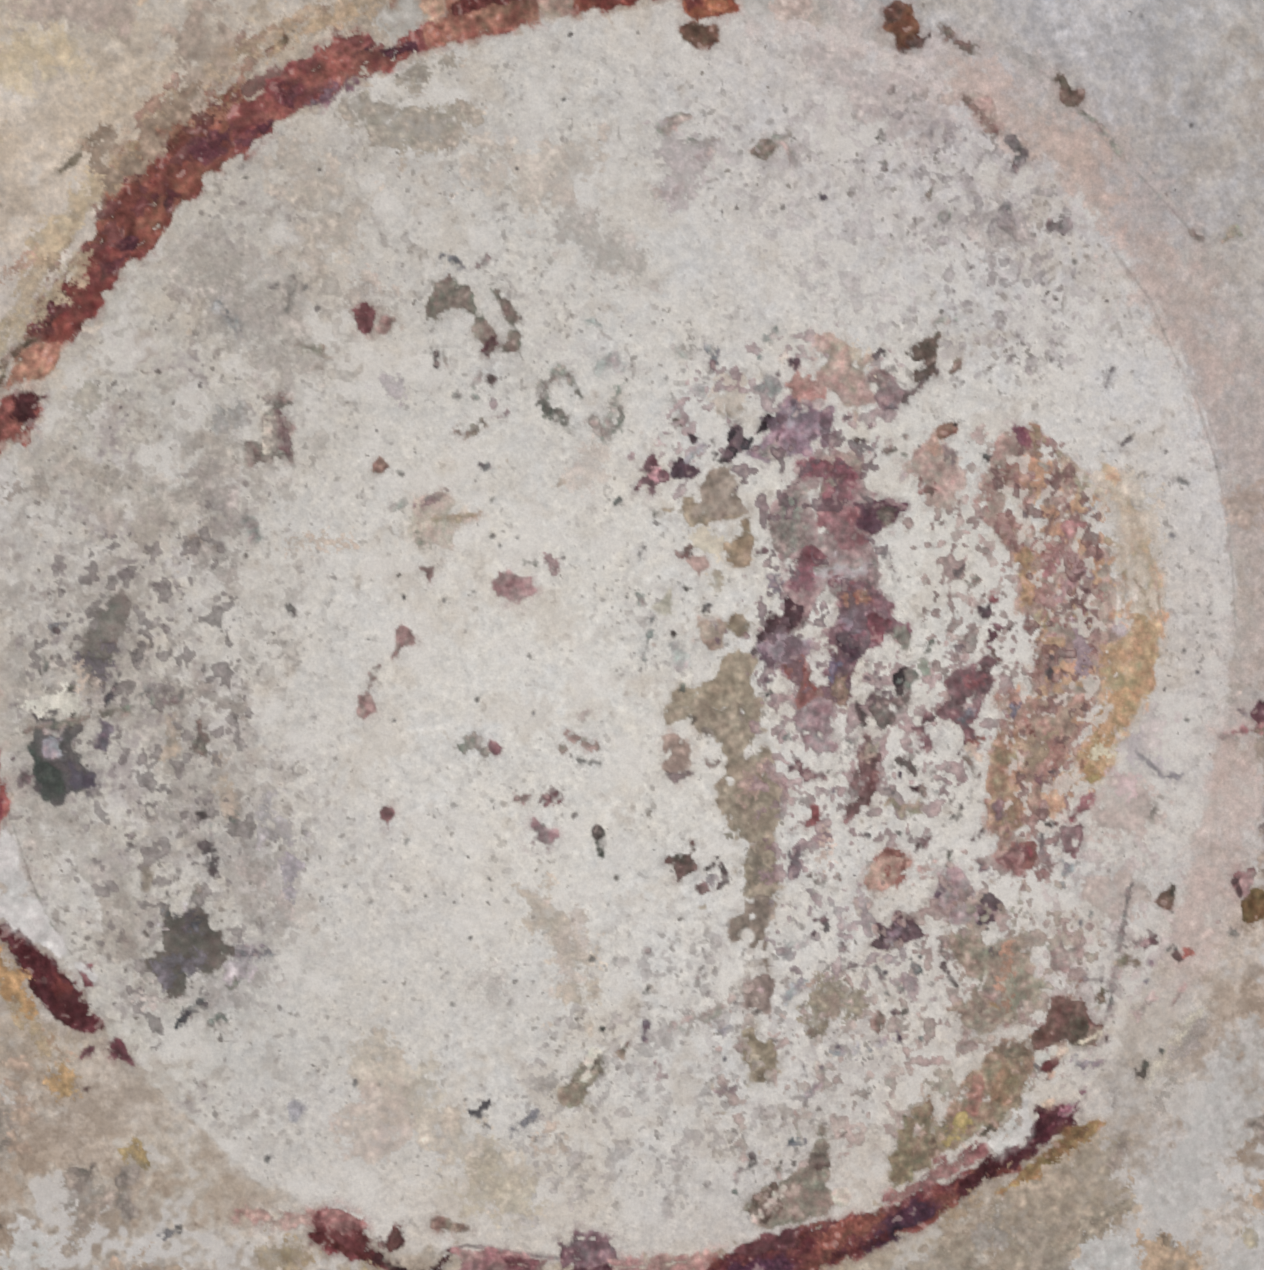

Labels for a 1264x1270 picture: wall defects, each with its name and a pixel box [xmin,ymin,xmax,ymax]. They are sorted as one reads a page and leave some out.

peeling [951,87,1014,146]
peeling [1003,28,1131,165]
peeling [1178,217,1254,251]
peeling [238,388,303,471]
peeling [1,622,219,767]
peeling [334,248,1198,1233]
peeling [194,805,211,822]
peeling [0,1212,63,1270]